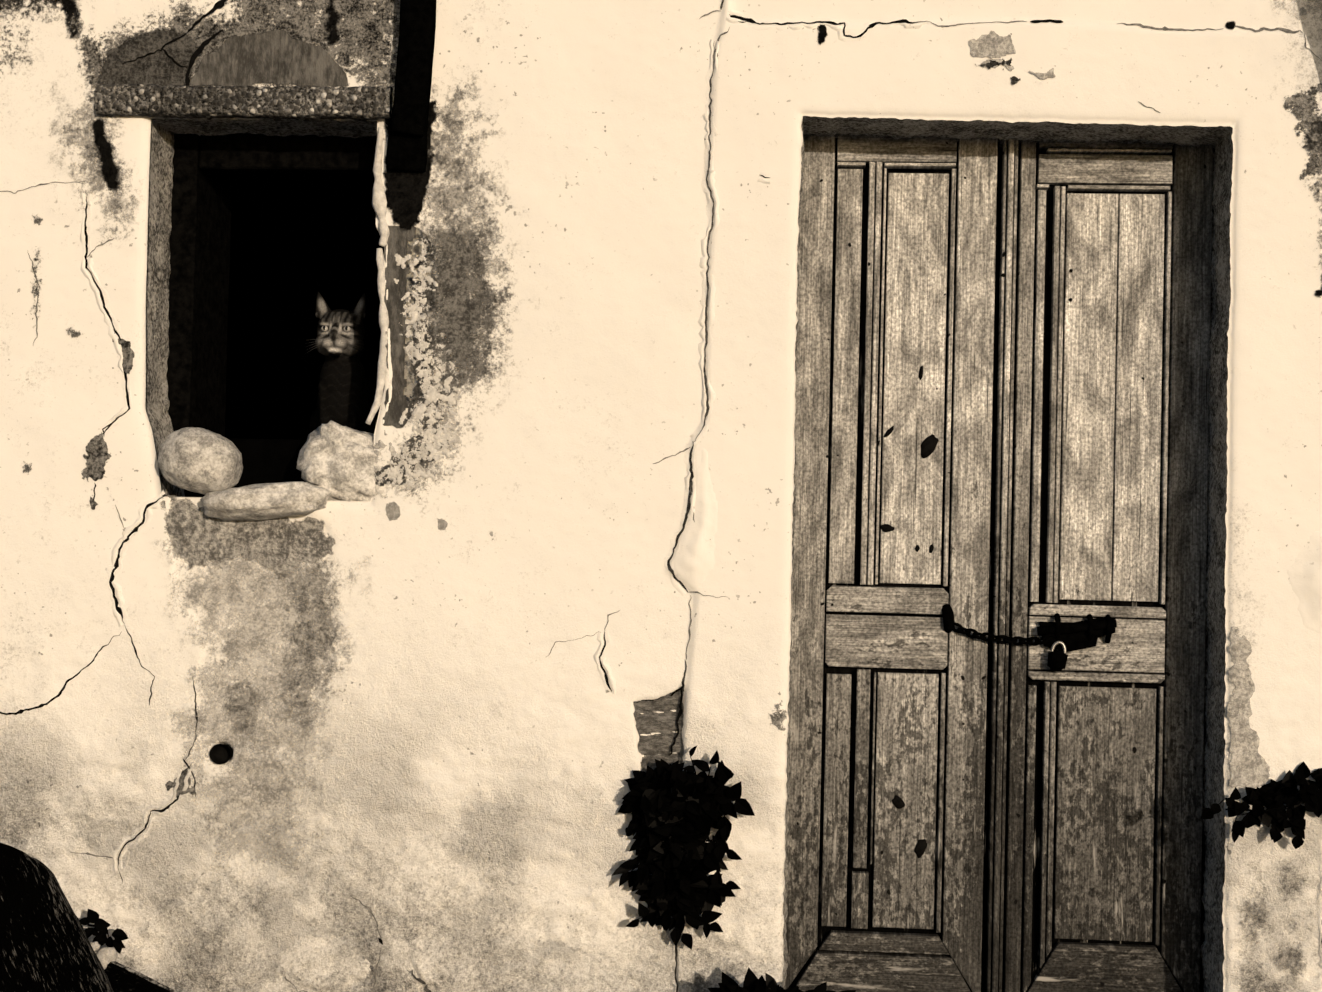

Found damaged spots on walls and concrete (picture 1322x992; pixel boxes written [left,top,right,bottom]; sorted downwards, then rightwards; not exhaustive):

crack [122,0,227,86]
leakage [0,0,400,234]
peeling [969,31,1055,85]
crack [1118,23,1322,61]
crack [0,181,132,441]
leakage [404,83,512,445]
crack [653,0,1063,691]
crack [0,484,167,715]
crack [71,676,198,883]
leakage [168,556,352,871]
crack [546,610,620,694]
spalling [633,684,684,772]